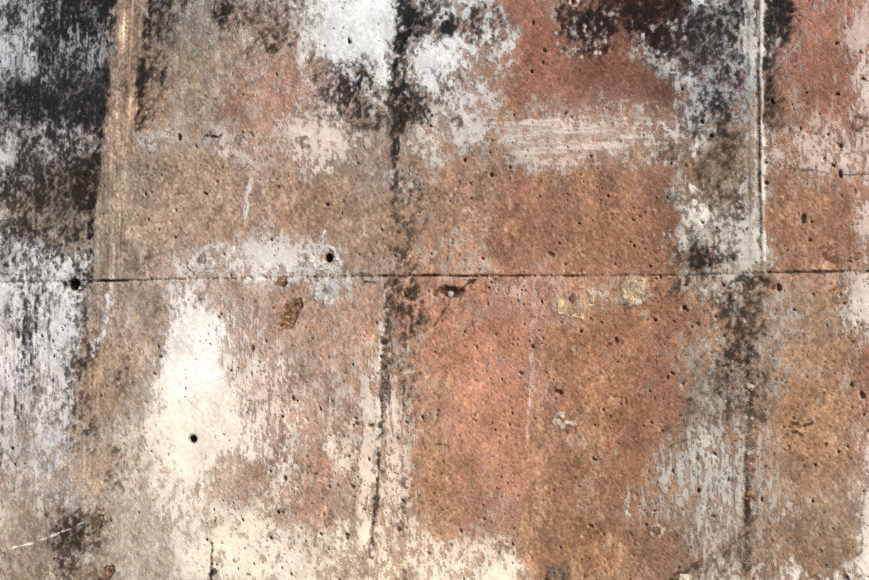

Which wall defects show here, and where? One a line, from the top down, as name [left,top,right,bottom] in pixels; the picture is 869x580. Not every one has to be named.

leakage [0,0,117,447]
leakage [212,0,302,53]
leakage [314,0,504,464]
corrosion [442,148,704,580]
leakage [555,0,746,293]
crack [760,267,869,275]